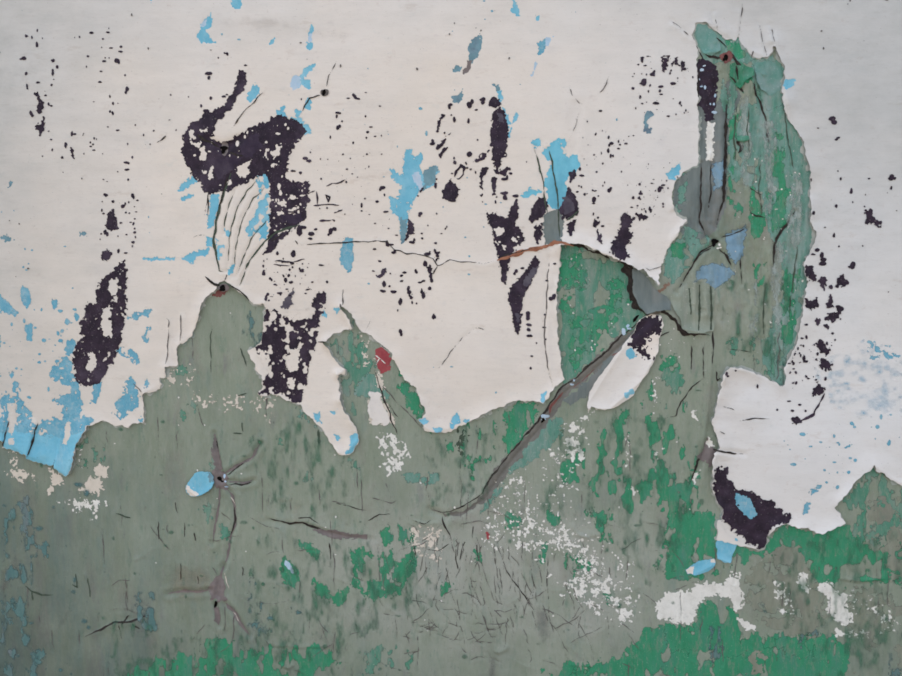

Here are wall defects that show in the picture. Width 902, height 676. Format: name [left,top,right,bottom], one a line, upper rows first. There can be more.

crack [673,7,798,313]
rust [497,240,574,261]
peeling [245,24,902,589]
peeling [160,314,188,385]
peeling [0,339,105,476]
peeling [111,376,149,422]
crack [151,149,784,676]
peeling [186,458,232,541]
peeling [311,524,418,607]
crack [3,572,54,648]
peeling [127,592,342,676]
peeling [540,600,850,676]